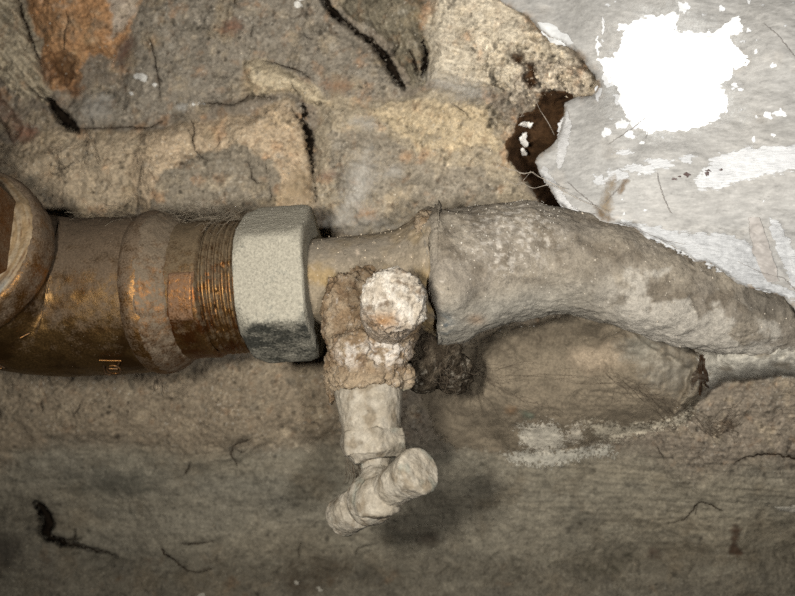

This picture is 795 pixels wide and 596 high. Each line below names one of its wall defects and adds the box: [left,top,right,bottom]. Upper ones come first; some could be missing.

crack [388,39,429,78]
peeling [538,22,573,46]
crack [262,60,318,202]
spalling [505,54,579,211]
peeling [592,1,758,193]
peeling [755,108,787,119]
peeling [693,133,795,191]
peeling [614,212,795,301]
crack [735,450,795,463]
crack [35,502,117,556]